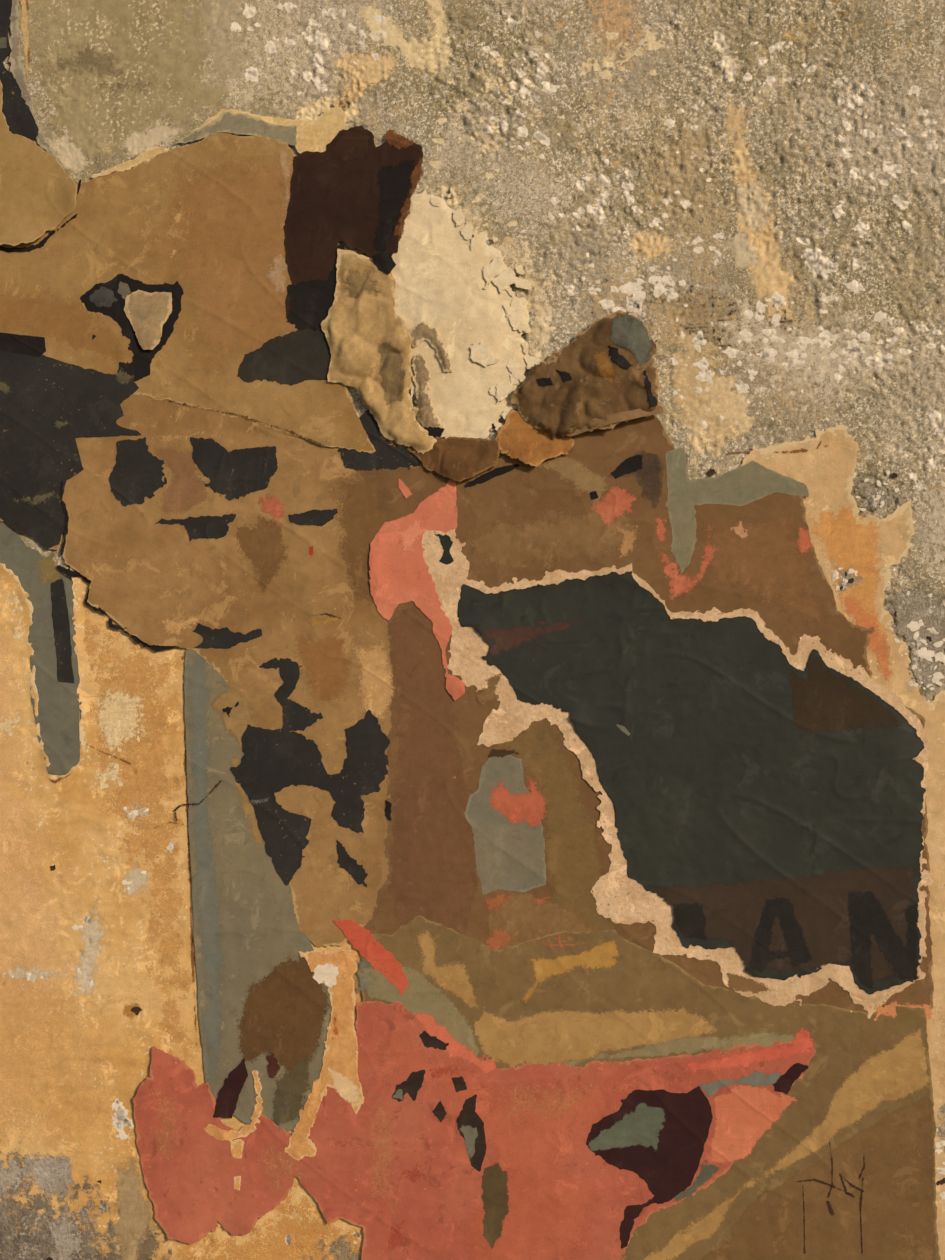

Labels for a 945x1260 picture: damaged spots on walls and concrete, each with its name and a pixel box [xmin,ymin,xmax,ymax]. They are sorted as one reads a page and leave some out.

leakage [183,0,454,123]
leakage [475,0,646,70]
leakage [712,31,737,83]
leakage [436,87,571,241]
leakage [580,62,945,593]
leakage [808,506,893,682]